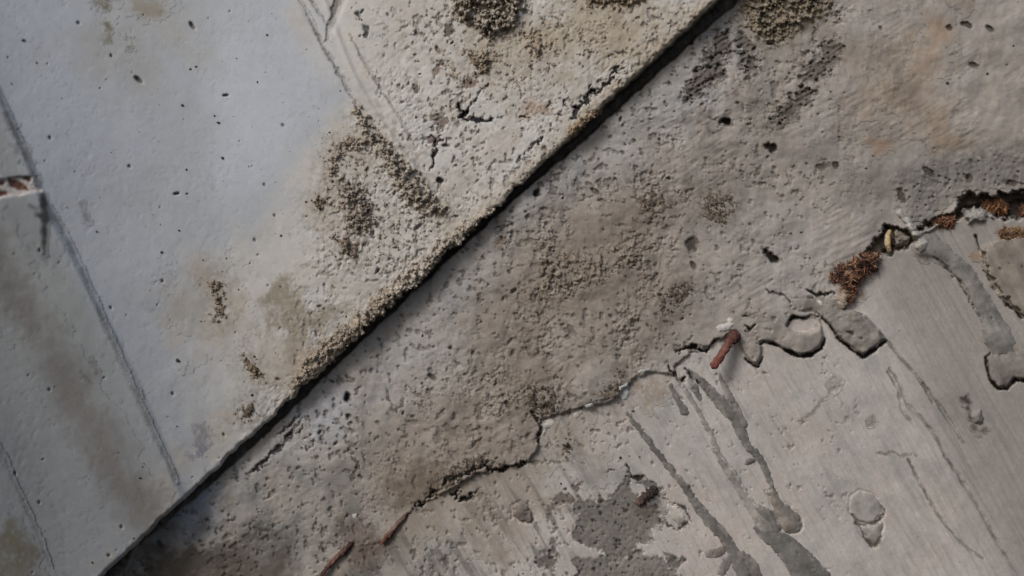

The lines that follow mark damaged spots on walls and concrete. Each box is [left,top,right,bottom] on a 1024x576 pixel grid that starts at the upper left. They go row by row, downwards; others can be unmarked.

crack [457,90,494,124]
spalling [698,190,737,227]
spalling [864,141,1024,256]
spalling [653,281,697,323]
peeling [716,318,734,332]
crack [415,411,543,508]
crack [606,464,646,482]
peeling [533,470,686,576]